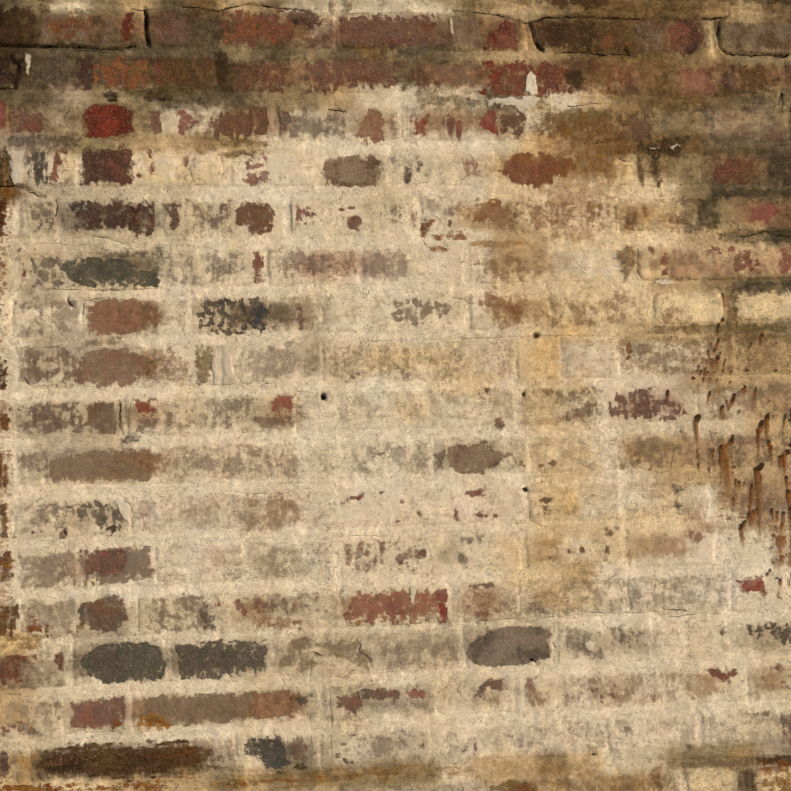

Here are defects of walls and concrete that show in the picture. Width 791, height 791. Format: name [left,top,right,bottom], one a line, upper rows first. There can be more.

damp [0,5,35,89]
crack [0,8,151,89]
crack [525,8,641,56]
crack [702,17,790,58]
damp [488,69,627,216]
damp [637,135,690,188]
rust [693,293,757,419]
rust [697,413,791,586]
spalling [80,642,166,684]
spalling [175,638,268,680]
spalling [466,626,552,667]
rust [0,739,225,791]